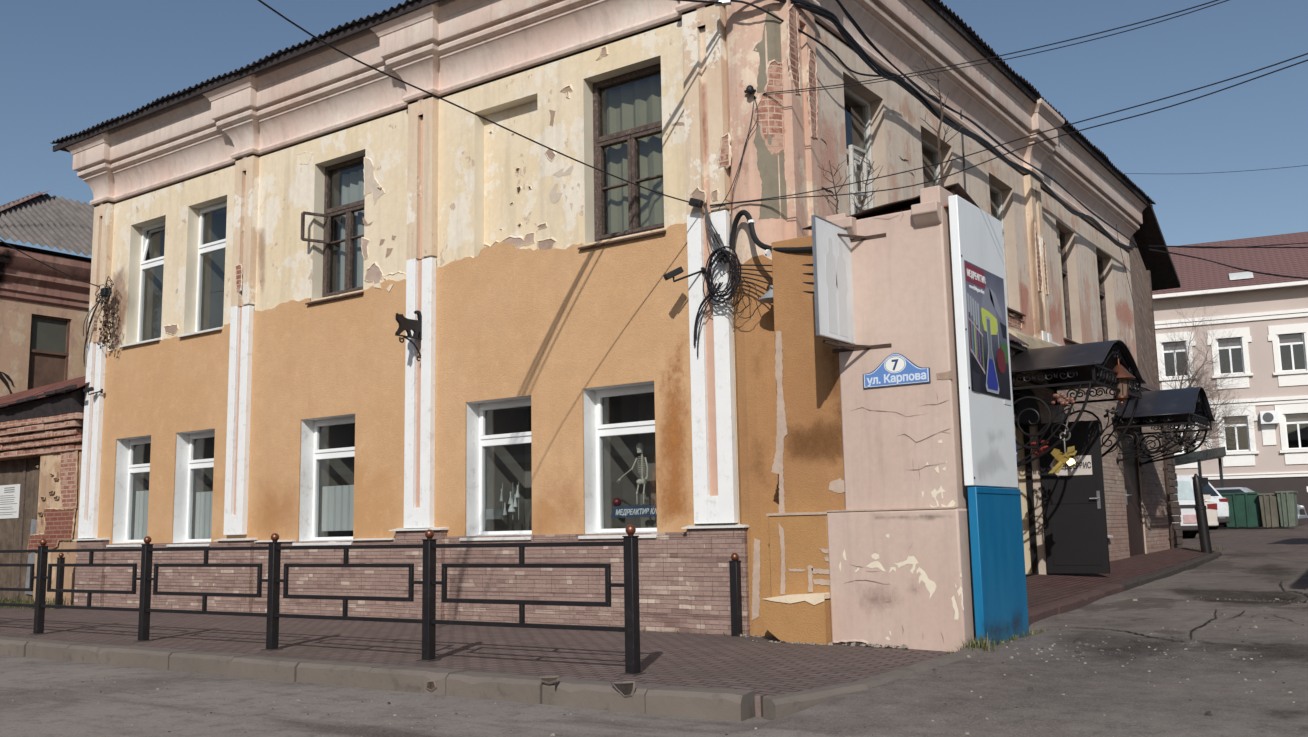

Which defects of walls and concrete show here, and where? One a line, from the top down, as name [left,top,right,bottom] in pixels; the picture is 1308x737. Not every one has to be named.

flaking render [753,4,818,219]
flaking render [717,132,732,169]
flaking render [363,157,385,206]
peeling [545,147,574,210]
flaking render [690,187,720,204]
flaking render [361,218,406,292]
flaking render [471,222,557,258]
peeling [788,549,936,598]
peeling [951,573,964,620]